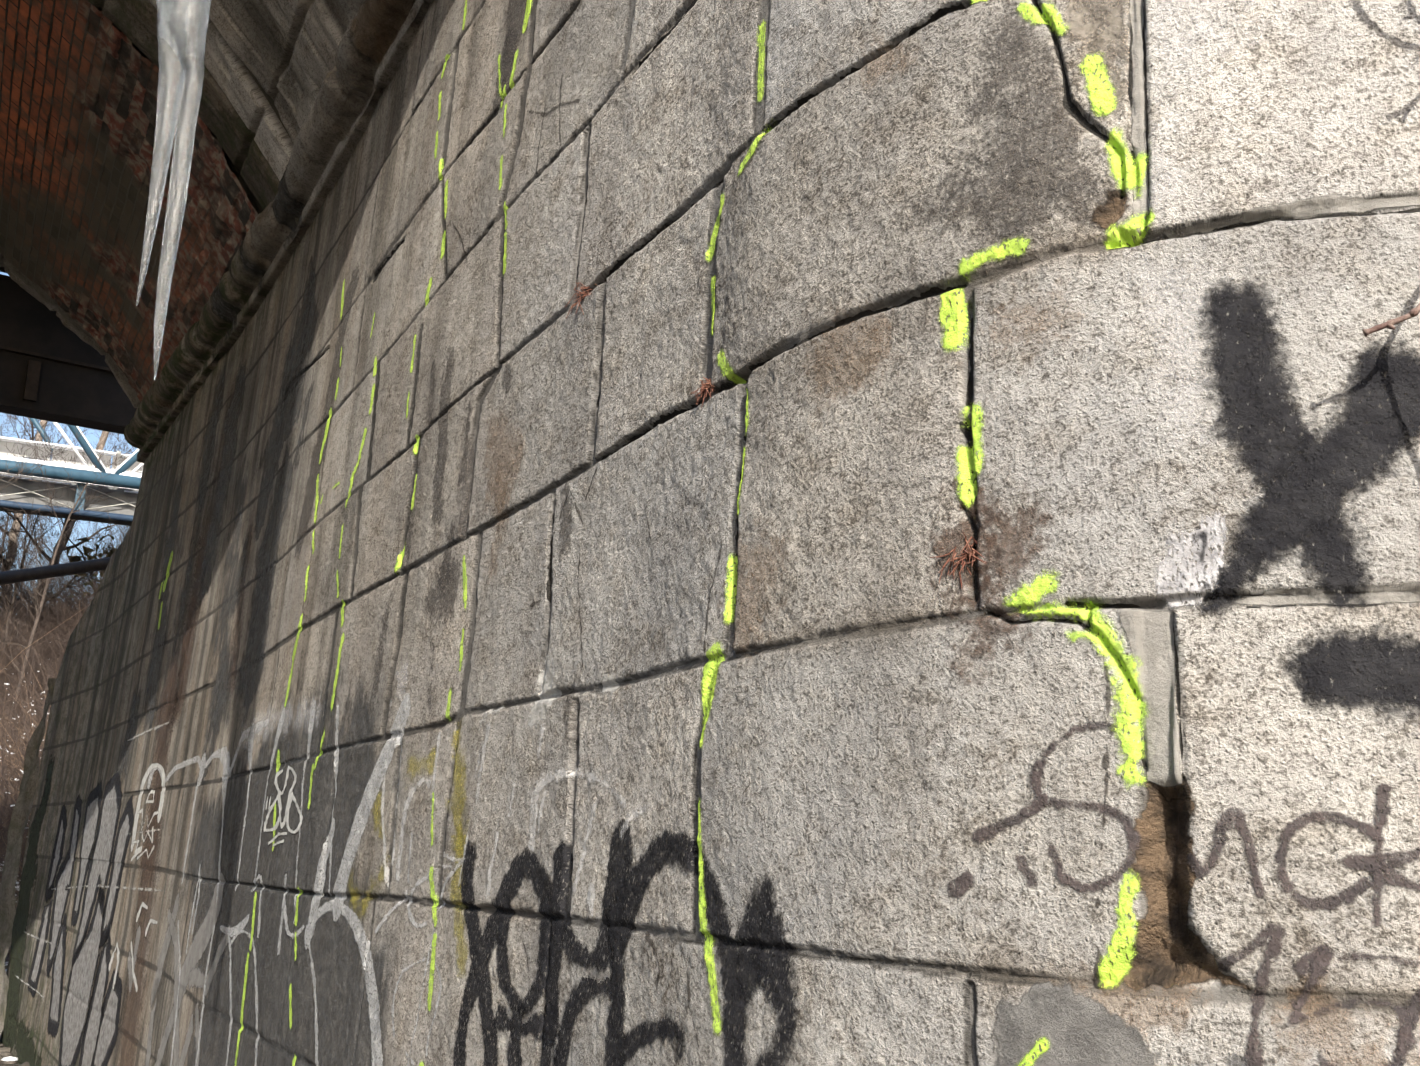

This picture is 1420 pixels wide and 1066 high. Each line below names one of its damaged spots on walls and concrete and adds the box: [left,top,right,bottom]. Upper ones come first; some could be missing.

crack [1032,0,1420,250]
water stain [114,256,360,785]
water stain [374,595,392,698]
crack [990,601,1147,849]
crack [1173,626,1184,781]
crack [1094,897,1103,988]
spalling [1100,775,1252,991]